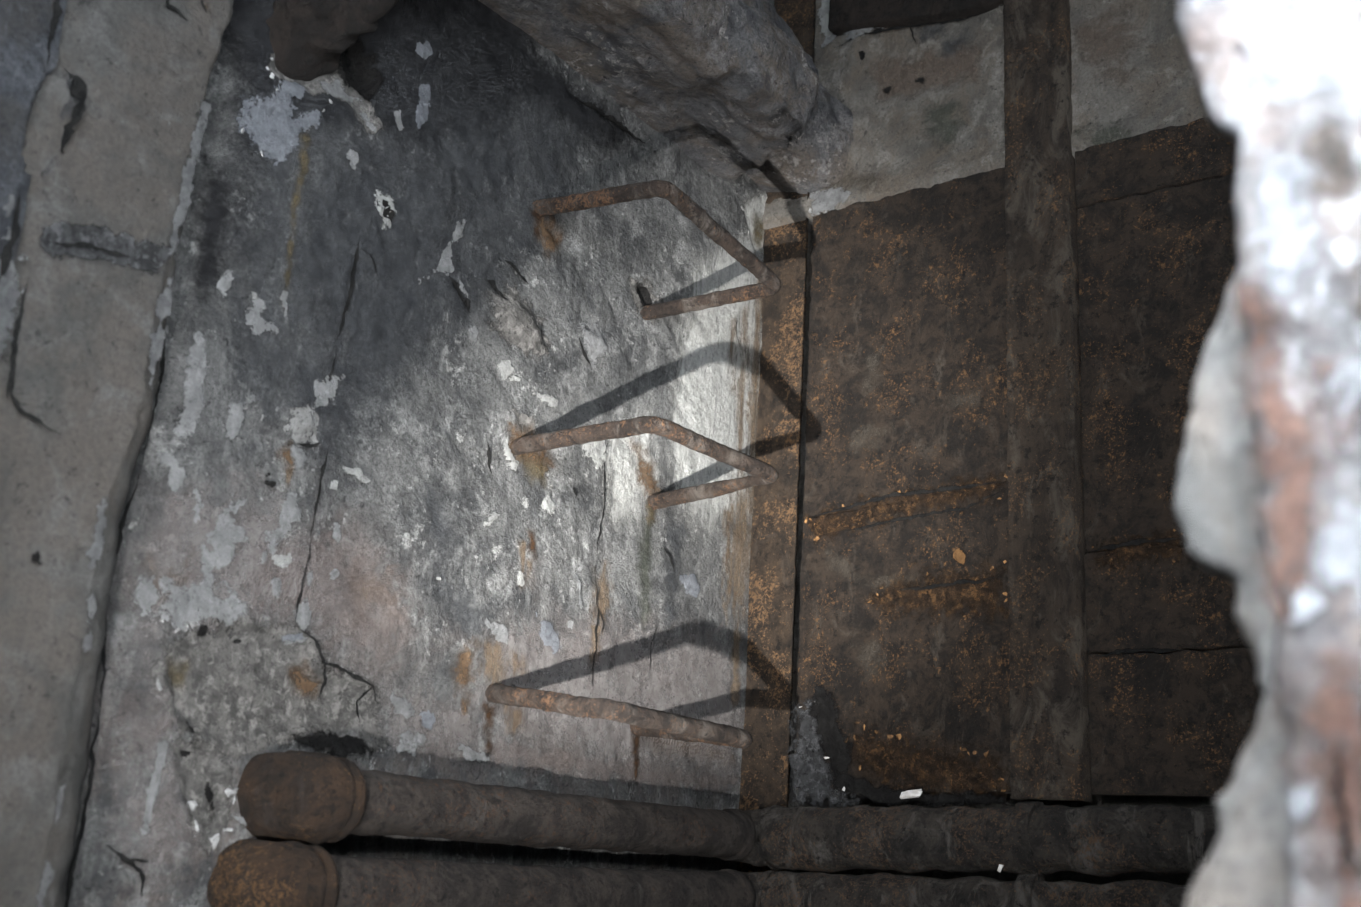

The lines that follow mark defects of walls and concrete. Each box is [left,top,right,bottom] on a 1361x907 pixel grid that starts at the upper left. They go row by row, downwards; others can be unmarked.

peeling [234,39,433,166]
peeling [346,149,359,170]
corrosion [630,441,660,524]
crack [294,444,378,720]